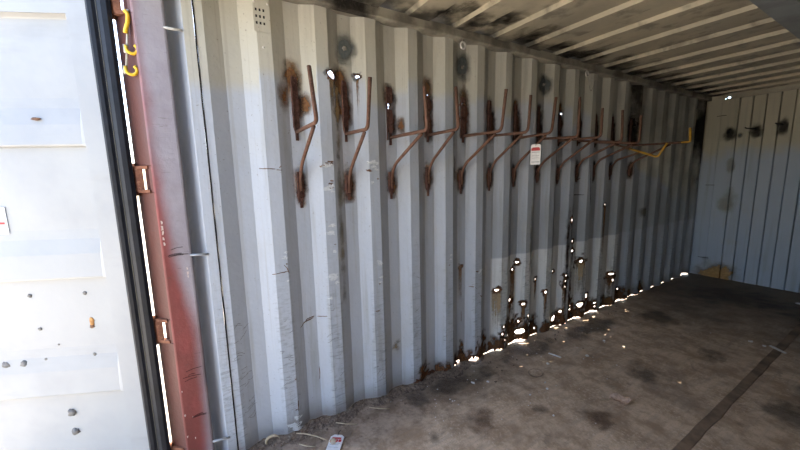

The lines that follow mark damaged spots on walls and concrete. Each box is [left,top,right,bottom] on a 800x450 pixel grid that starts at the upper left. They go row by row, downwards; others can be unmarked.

rust [278,61,311,119]
rust [325,68,362,126]
rust [384,83,405,134]
rust [423,79,433,141]
rust [459,90,469,139]
rust [513,100,521,142]
rust [343,171,355,202]
rust [413,214,643,383]